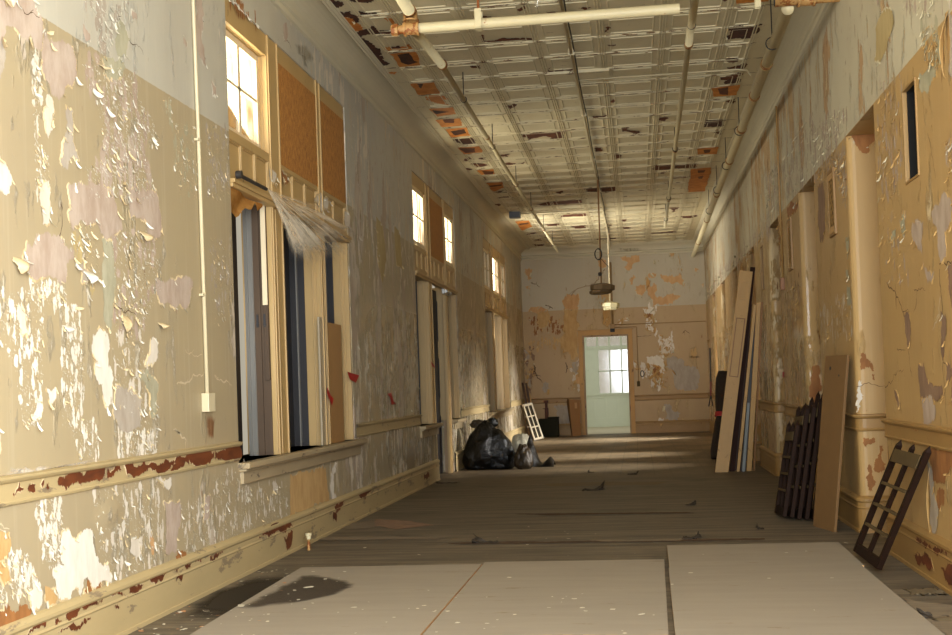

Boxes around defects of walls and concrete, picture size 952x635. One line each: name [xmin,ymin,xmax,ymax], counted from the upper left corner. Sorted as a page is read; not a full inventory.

corrosion [328,0,420,74]
peeling [0,0,344,635]
peeling [524,293,580,393]
peeling [621,255,700,392]
peeling [705,199,798,299]
crack [888,261,951,331]
peeling [554,404,570,424]
peeling [914,448,952,586]